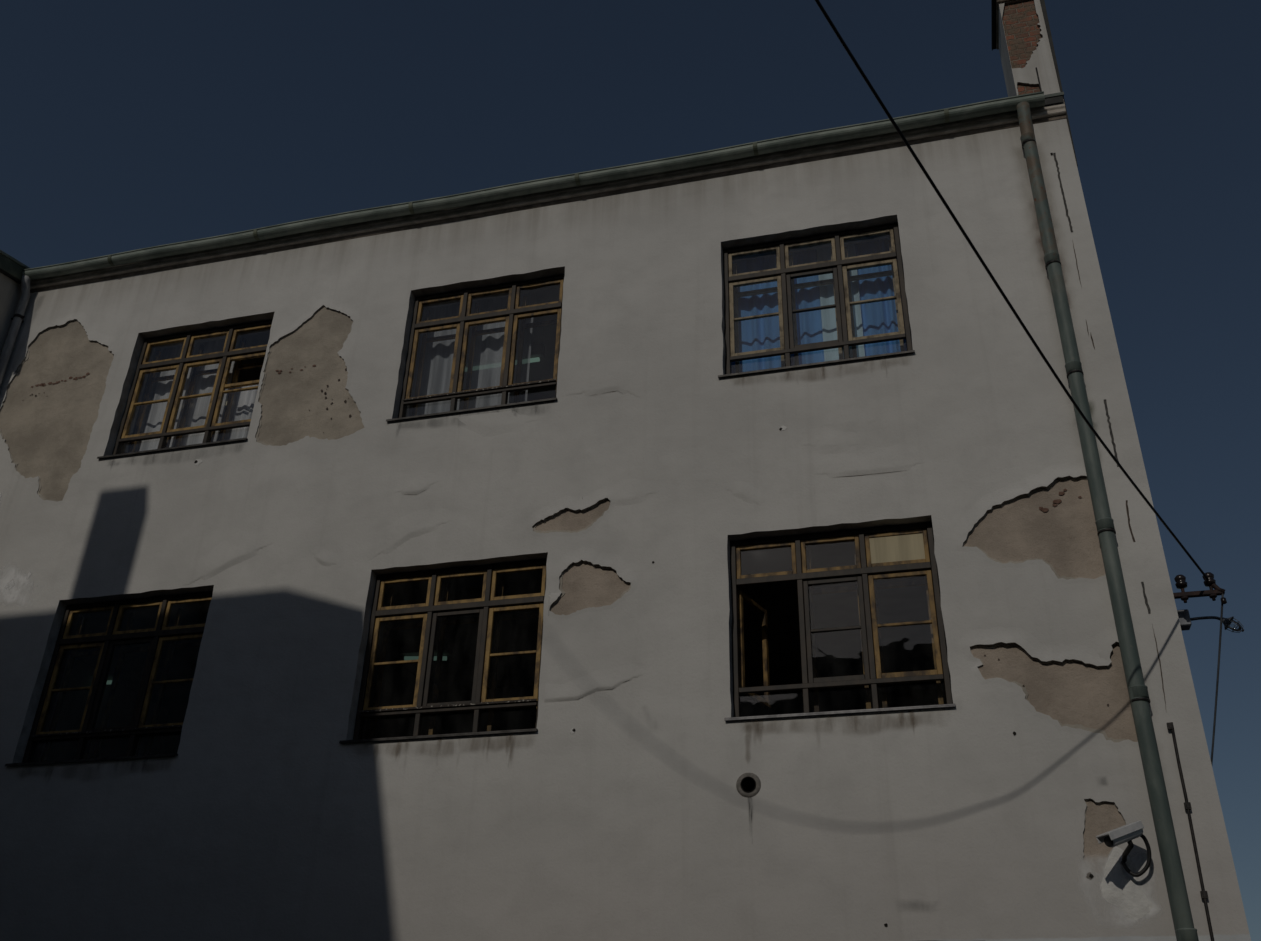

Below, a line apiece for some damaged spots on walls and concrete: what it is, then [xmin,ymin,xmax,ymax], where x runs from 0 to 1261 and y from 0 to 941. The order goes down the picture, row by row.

flaking render [1002,0,1043,95]
flaking render [0,311,122,506]
flaking render [251,297,369,449]
flaking render [525,487,640,620]
flaking render [953,463,1107,584]
flaking render [958,626,1139,749]
flaking render [1069,782,1135,880]